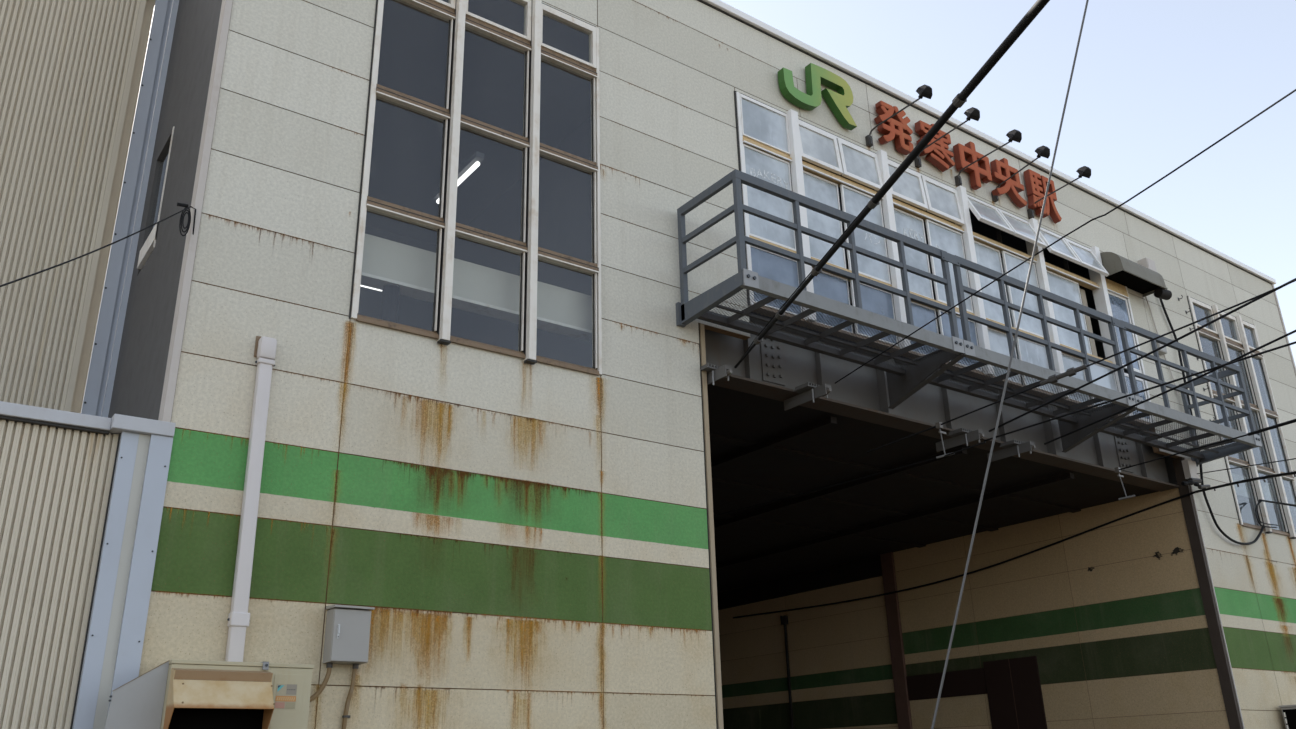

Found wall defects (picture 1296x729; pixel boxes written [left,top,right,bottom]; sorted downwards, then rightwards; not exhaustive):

rust [394,460,602,503]
rust [370,606,706,662]